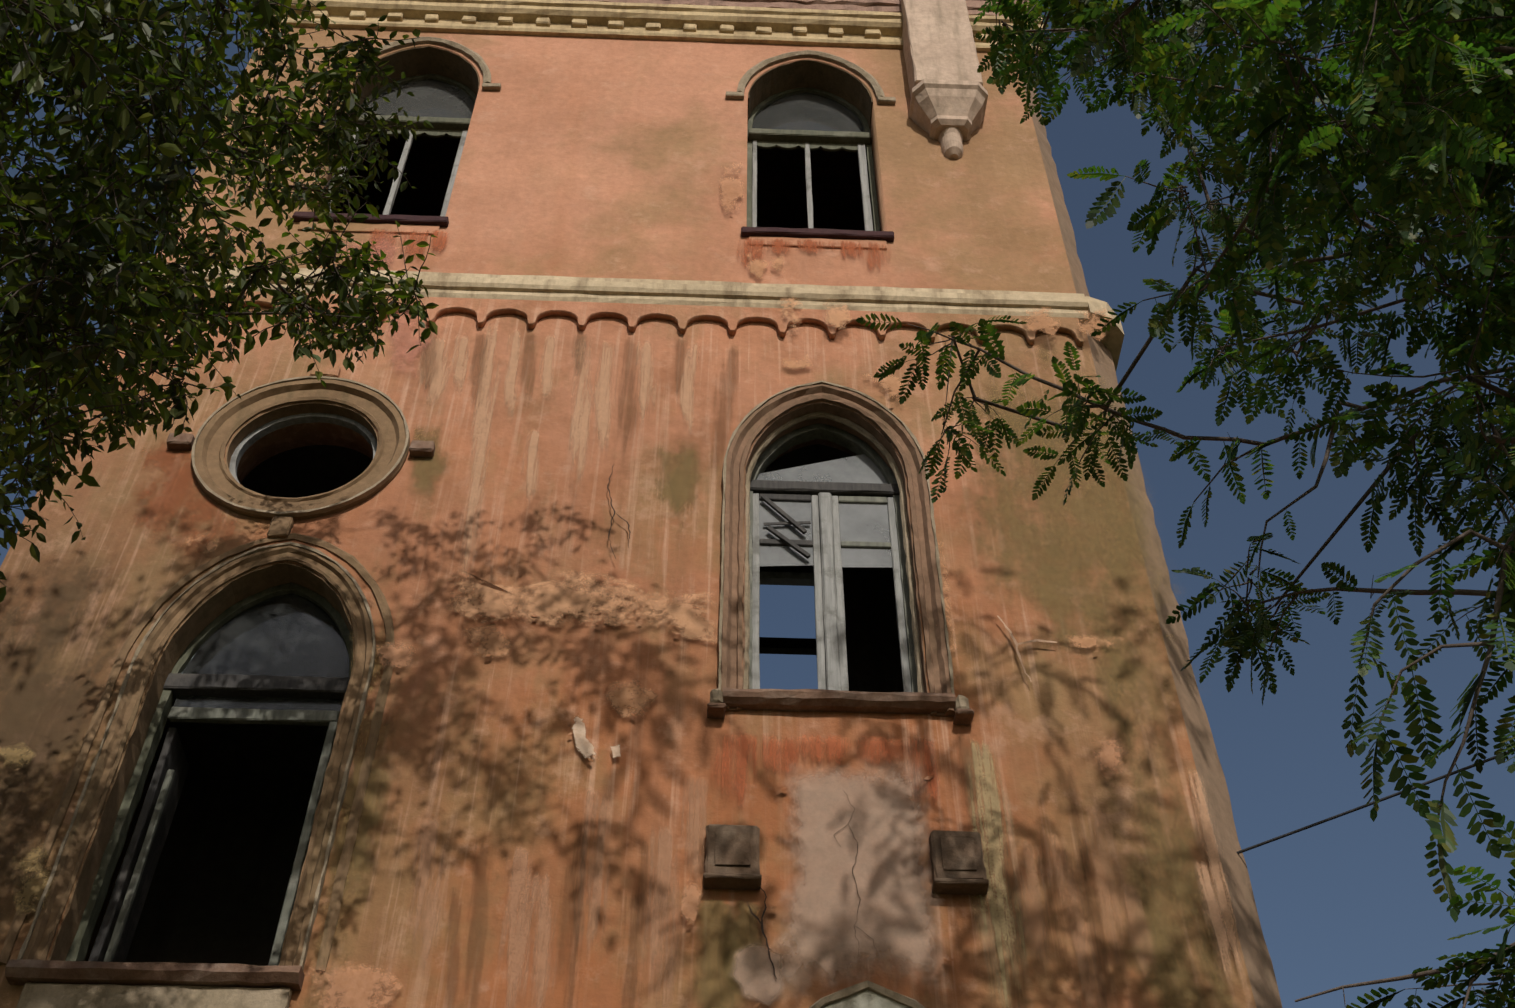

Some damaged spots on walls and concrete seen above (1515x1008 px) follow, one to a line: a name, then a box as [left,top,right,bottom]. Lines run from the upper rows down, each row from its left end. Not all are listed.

water stain [394,319,520,565]
water stain [570,338,613,476]
water stain [680,344,697,427]
peeling [826,306,850,329]
peeling [377,643,411,668]
peeling [453,570,716,657]
water stain [979,397,1147,702]
flaking render [0,743,34,771]
flaking render [568,717,621,762]
crack [834,796,879,961]
water stain [968,742,1025,1000]
water stain [1133,772,1240,1008]